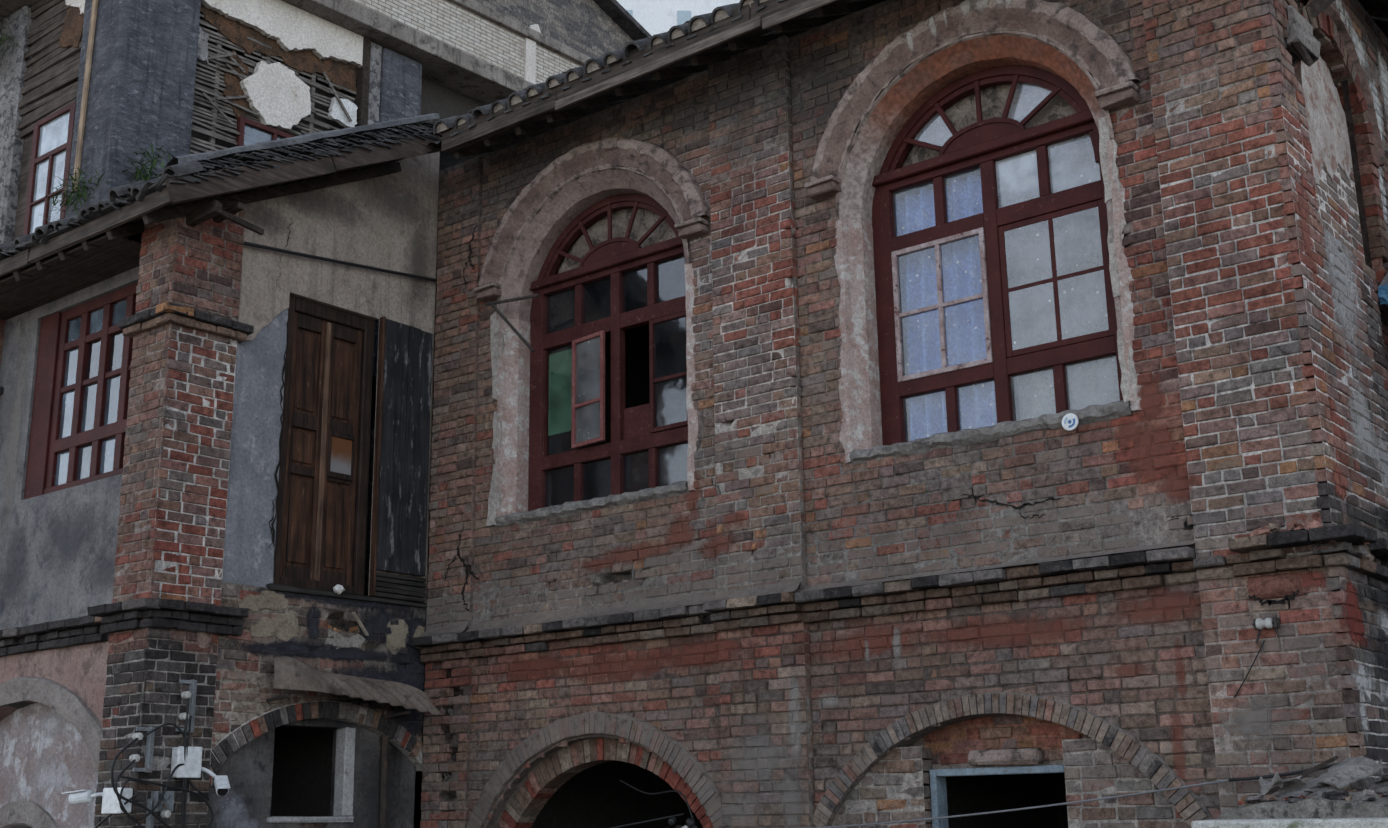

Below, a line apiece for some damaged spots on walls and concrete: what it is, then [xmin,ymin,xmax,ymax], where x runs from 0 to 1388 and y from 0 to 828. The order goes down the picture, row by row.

peeling [197,0,364,131]
crack [960,494,1061,519]
crack [445,526,479,612]
peeling [238,590,298,642]
peeling [324,624,365,649]
peeling [385,619,425,655]
damp [1380,613,1388,634]
damp [1353,664,1388,730]